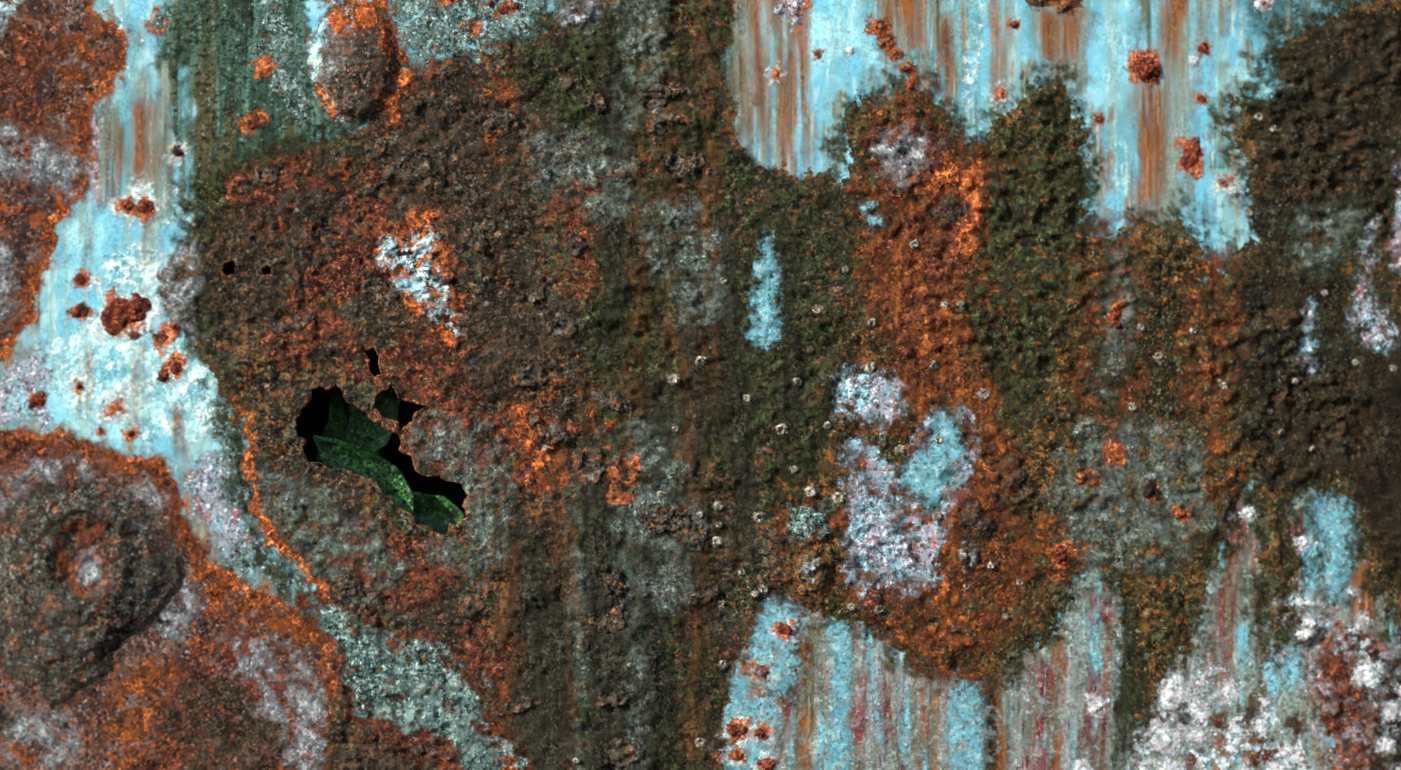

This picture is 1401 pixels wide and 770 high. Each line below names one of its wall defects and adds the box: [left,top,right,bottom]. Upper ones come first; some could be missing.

rust [988,0,1084,103]
rust [0,0,1046,770]
rust [1075,439,1126,488]
rust [1049,539,1076,569]
rust [1199,506,1248,662]
rust [1290,516,1304,559]
rust [1010,594,1123,770]